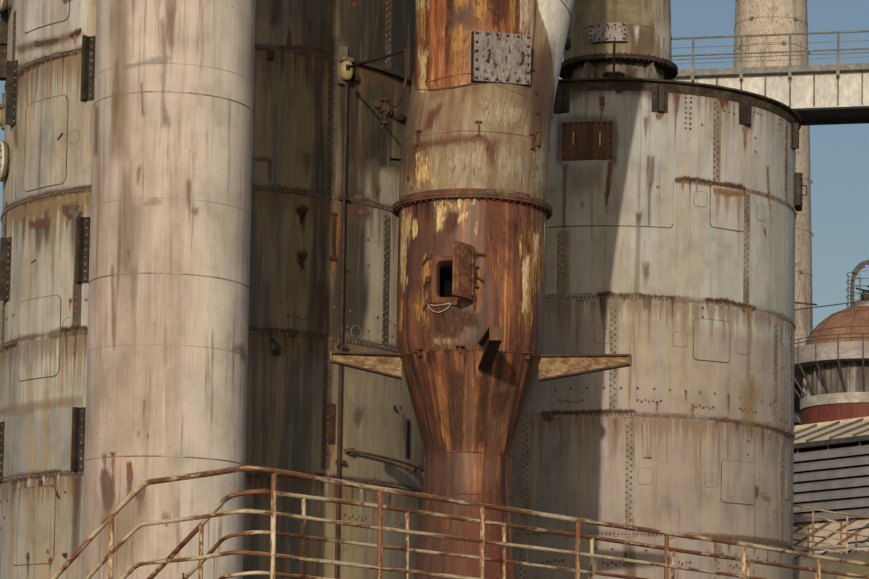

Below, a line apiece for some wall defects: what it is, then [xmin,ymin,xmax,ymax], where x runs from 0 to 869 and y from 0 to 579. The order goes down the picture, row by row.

rust [445,0,454,73]
rust [479,0,511,25]
rust [29,217,50,245]
peeling [411,151,434,190]
peeling [433,198,476,234]
peeling [446,140,548,200]
rust [675,176,746,207]
peeling [399,206,460,331]
peeling [516,212,547,330]
rust [597,291,674,316]
rust [705,297,755,392]
rust [416,199,509,579]